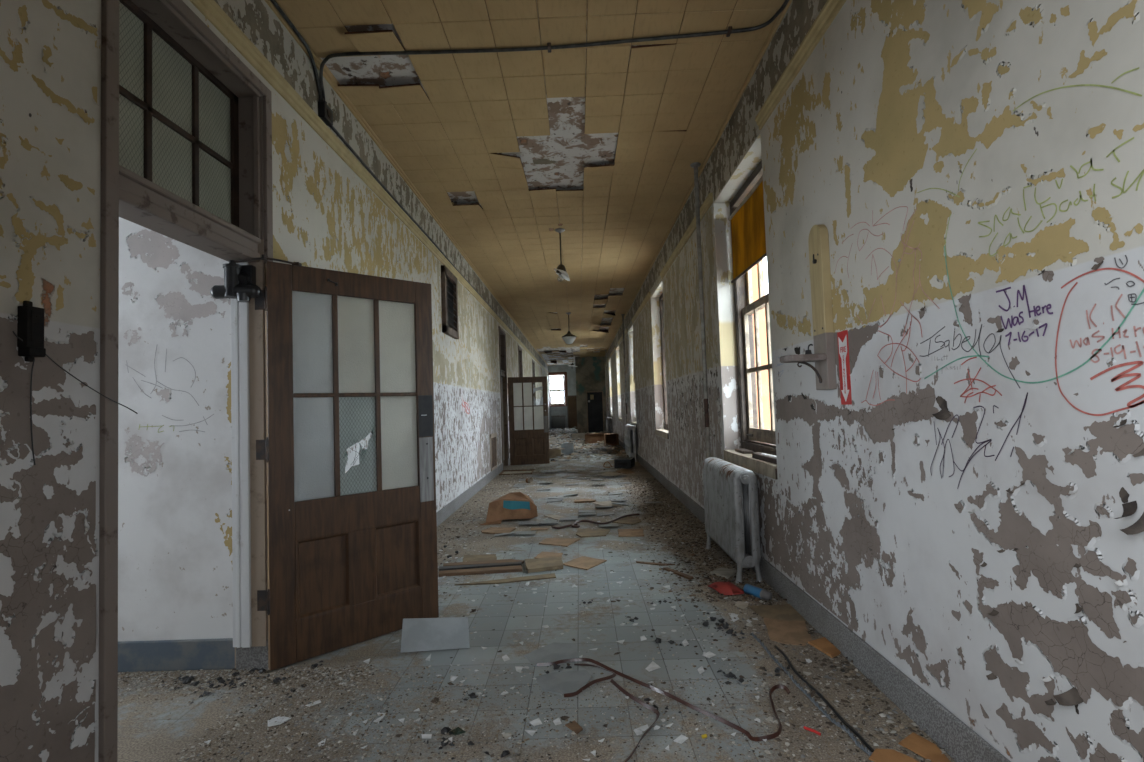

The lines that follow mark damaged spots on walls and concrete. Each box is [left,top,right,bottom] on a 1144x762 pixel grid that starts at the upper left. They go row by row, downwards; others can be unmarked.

peeling [0,0,100,125]
peeling [214,0,548,510]
peeling [605,0,827,507]
peeling [764,71,843,215]
peeling [831,0,1144,384]
peeling [0,117,98,762]
peeling [215,509,232,563]
peeling [756,363,1011,632]
peeling [895,607,966,690]
peeling [946,409,1144,762]